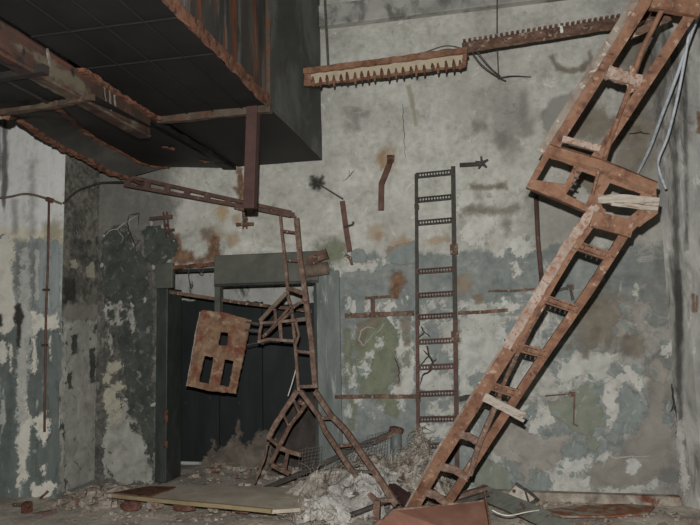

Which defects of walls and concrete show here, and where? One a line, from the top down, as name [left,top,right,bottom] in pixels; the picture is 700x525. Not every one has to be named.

corrosion [161,0,270,106]
peeling [0,221,178,499]
corrosion [172,234,220,270]
peeling [329,240,415,277]
corrosion [390,272,405,298]
peeling [343,296,523,442]
peeling [456,184,536,279]
leakage [575,129,688,492]
peeling [659,339,672,359]
peeling [465,348,648,491]
peeling [588,476,660,494]